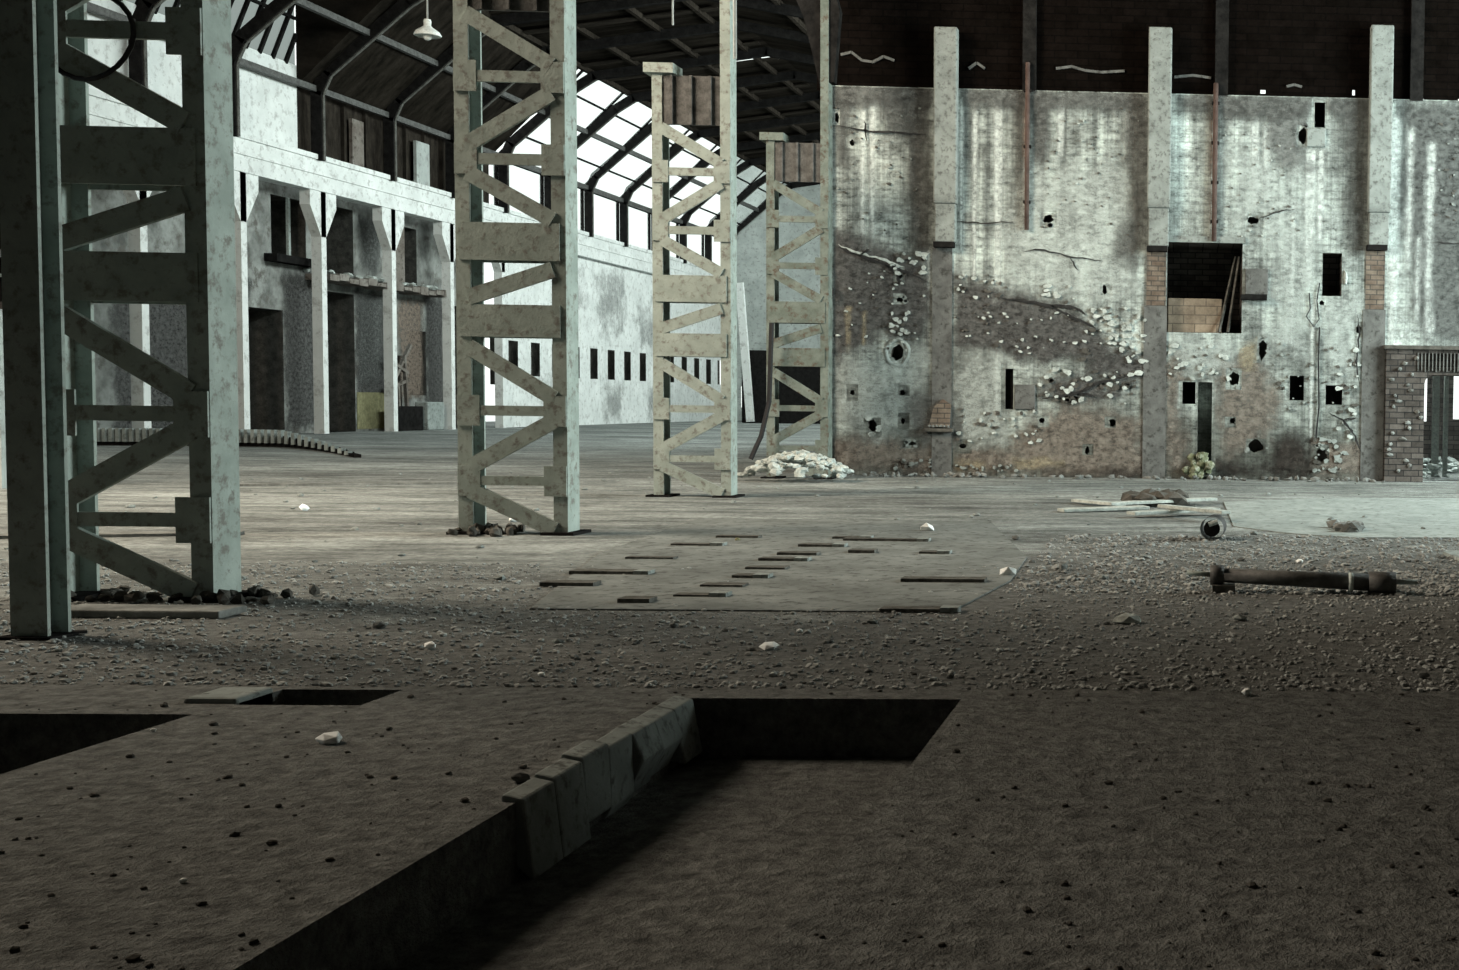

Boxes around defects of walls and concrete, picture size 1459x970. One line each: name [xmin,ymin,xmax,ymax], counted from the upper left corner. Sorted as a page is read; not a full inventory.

damp [960,98,977,275]
damp [995,94,1064,290]
damp [1390,100,1459,340]
spalling [865,415,881,437]
spalling [836,251,929,361]
peeling [893,418,932,472]
flaking render [928,252,1166,474]
peeling [1165,343,1242,404]
spalling [1244,435,1268,453]
spalling [1255,326,1362,473]